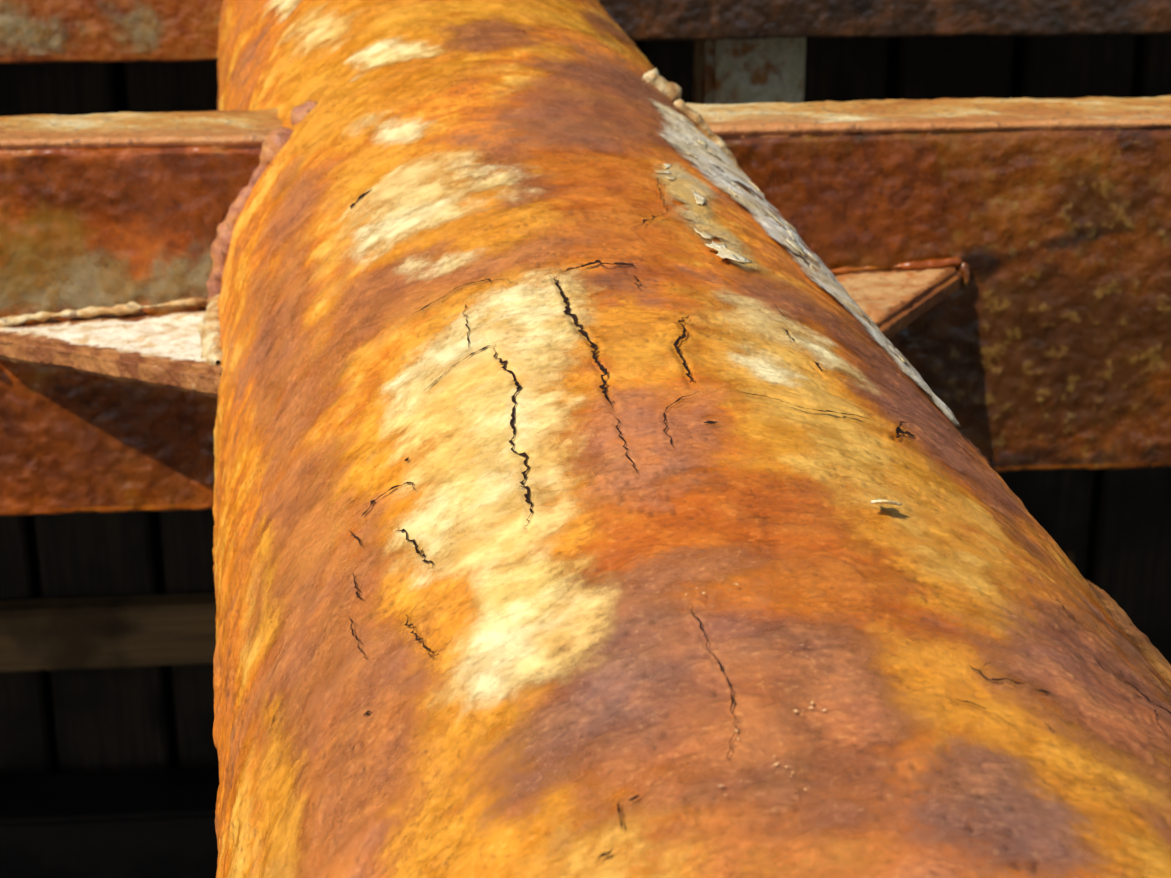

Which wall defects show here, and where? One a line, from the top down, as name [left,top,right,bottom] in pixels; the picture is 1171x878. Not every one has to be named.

corrosion [447,21,534,52]
corrosion [0,153,247,237]
peeling [652,100,957,421]
corrosion [0,383,196,508]
crack [350,482,416,546]
crack [396,526,433,568]
crack [412,279,533,528]
crack [554,260,639,474]
corrosion [246,60,1115,878]
crack [663,317,699,447]
crack [405,615,439,658]
corrosion [986,599,1171,828]